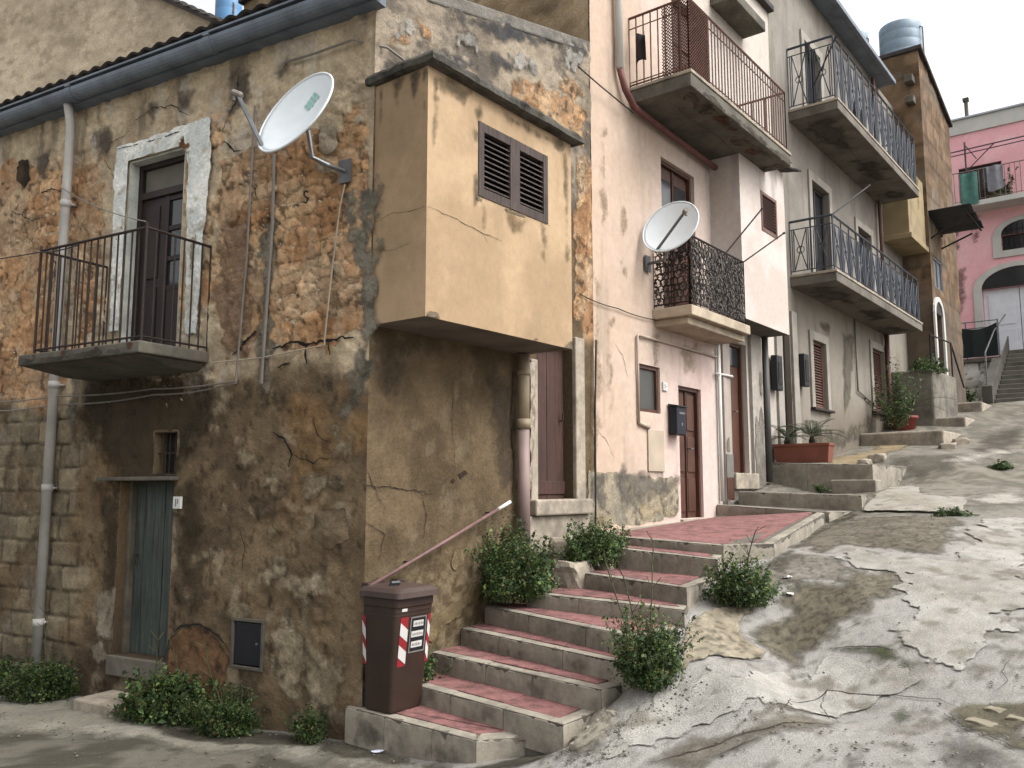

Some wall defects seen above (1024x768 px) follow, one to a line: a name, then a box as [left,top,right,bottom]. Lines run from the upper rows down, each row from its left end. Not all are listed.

spalling [388,19,431,46]
peeling [457,33,478,53]
crack [105,98,188,176]
spalling [0,117,384,458]
crack [232,331,354,368]
crack [273,420,329,467]
peeling [263,472,343,500]
crack [362,458,433,558]
peeling [588,470,679,528]
water stain [593,465,680,509]
spalling [164,623,230,705]
crack [646,690,1022,763]